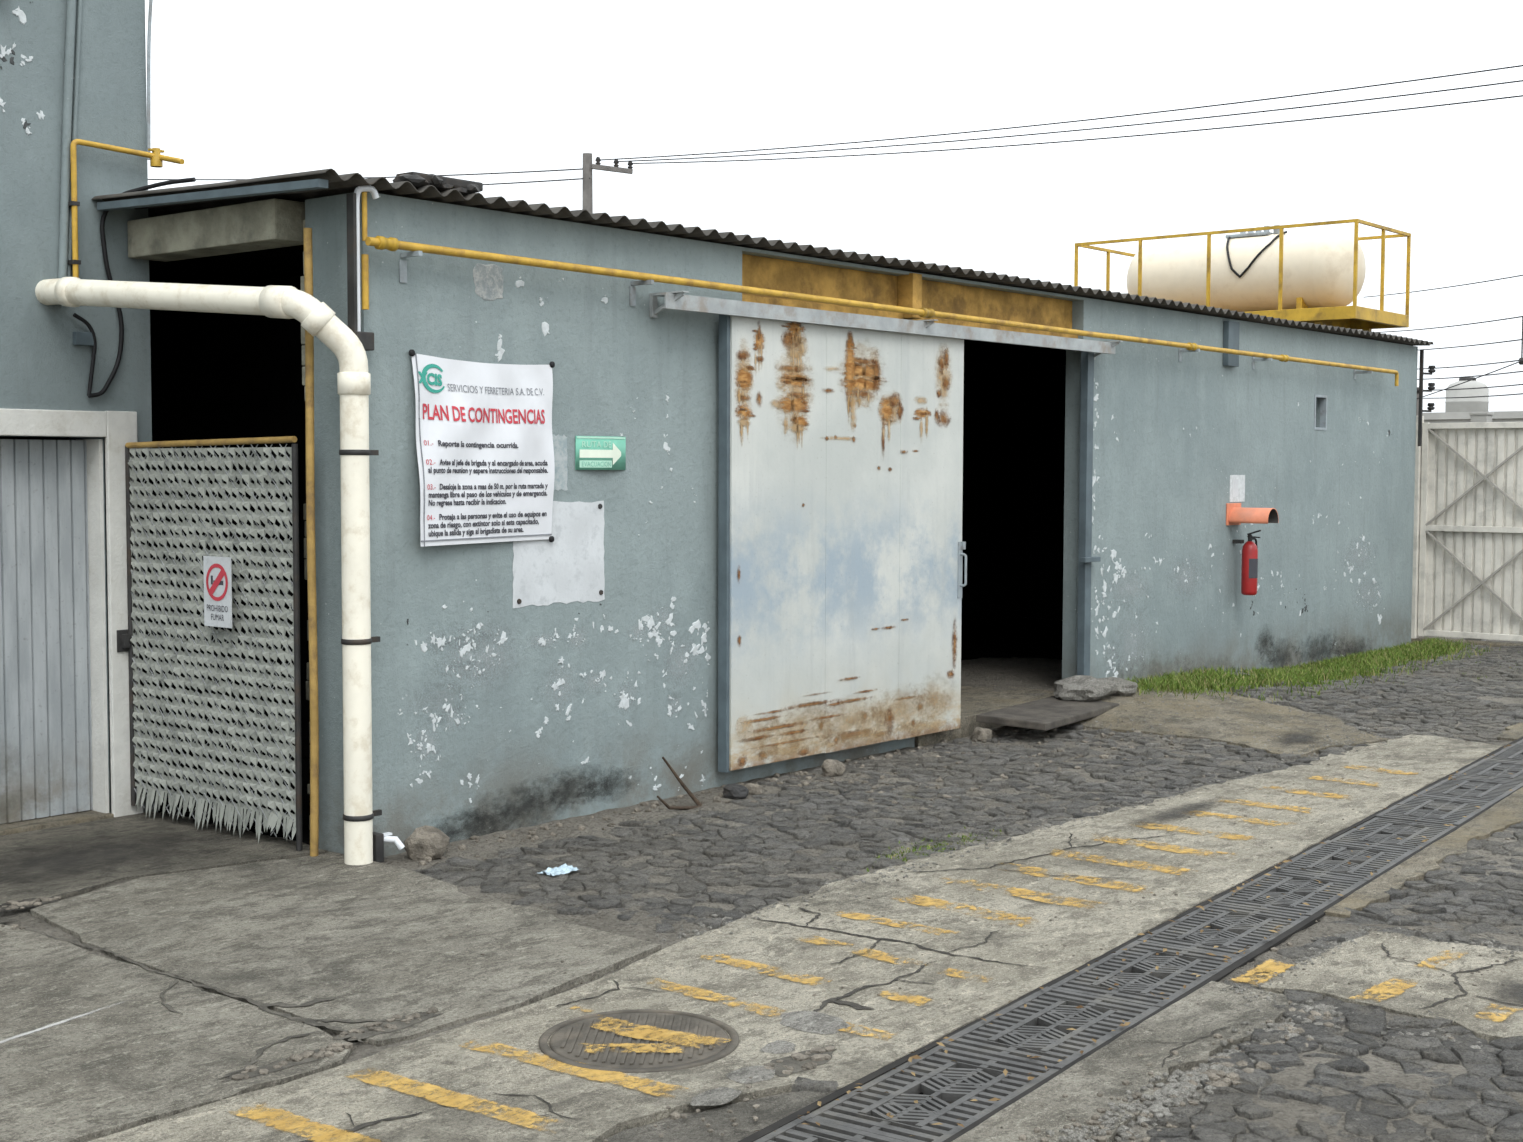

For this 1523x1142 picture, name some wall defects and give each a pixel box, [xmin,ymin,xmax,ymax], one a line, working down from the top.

peeling [0,42,33,69]
rust [735,322,809,444]
rust [826,333,950,471]
peeling [1091,470,1308,677]
peeling [398,608,508,787]
peeling [533,597,711,738]
rust [739,677,944,765]
rust [947,621,957,677]
leakage [446,777,618,837]
crack [0,853,424,1080]
crack [752,907,1044,1029]
crack [1381,943,1523,1009]